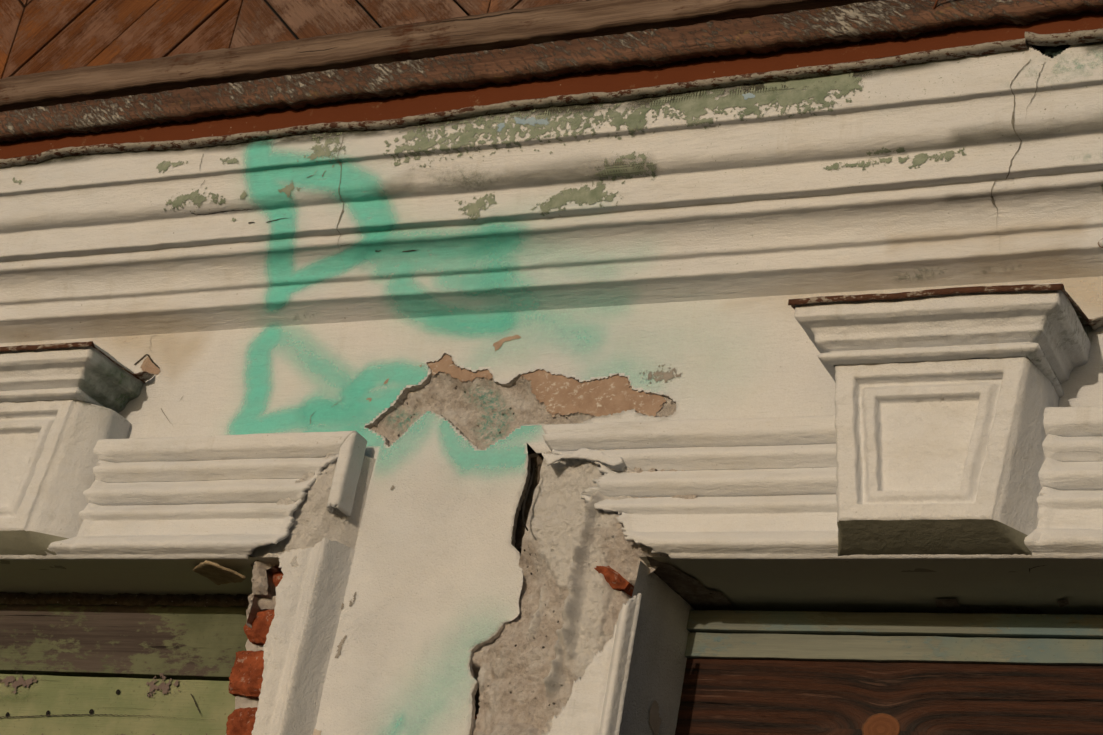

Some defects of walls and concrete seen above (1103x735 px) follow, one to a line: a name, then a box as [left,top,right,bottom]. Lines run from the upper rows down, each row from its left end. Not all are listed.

peeling [156,160,188,173]
peeling [163,187,247,211]
peeling [455,191,497,221]
peeling [531,151,663,216]
peeling [381,72,863,169]
peeling [820,147,965,172]
crack [991,60,1045,219]
flaking render [369,354,676,450]
flaking render [193,453,376,735]
flaking render [472,448,735,735]